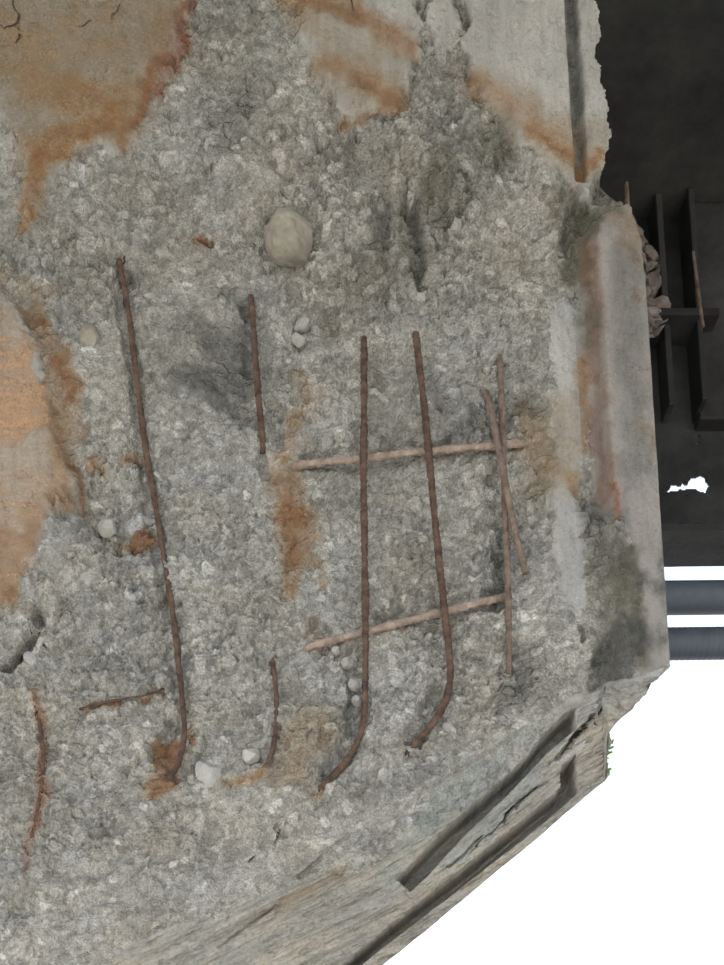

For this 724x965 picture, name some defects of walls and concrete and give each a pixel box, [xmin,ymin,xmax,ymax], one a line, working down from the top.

spalling [169,0,351,135]
spalling [540,169,587,327]
spalling [587,181,623,220]
rust [0,307,103,604]
rust [117,529,156,556]
spalling [366,456,440,627]
spalling [433,451,505,607]
spalling [573,421,645,692]
rust [144,732,196,799]
spalling [69,709,553,965]